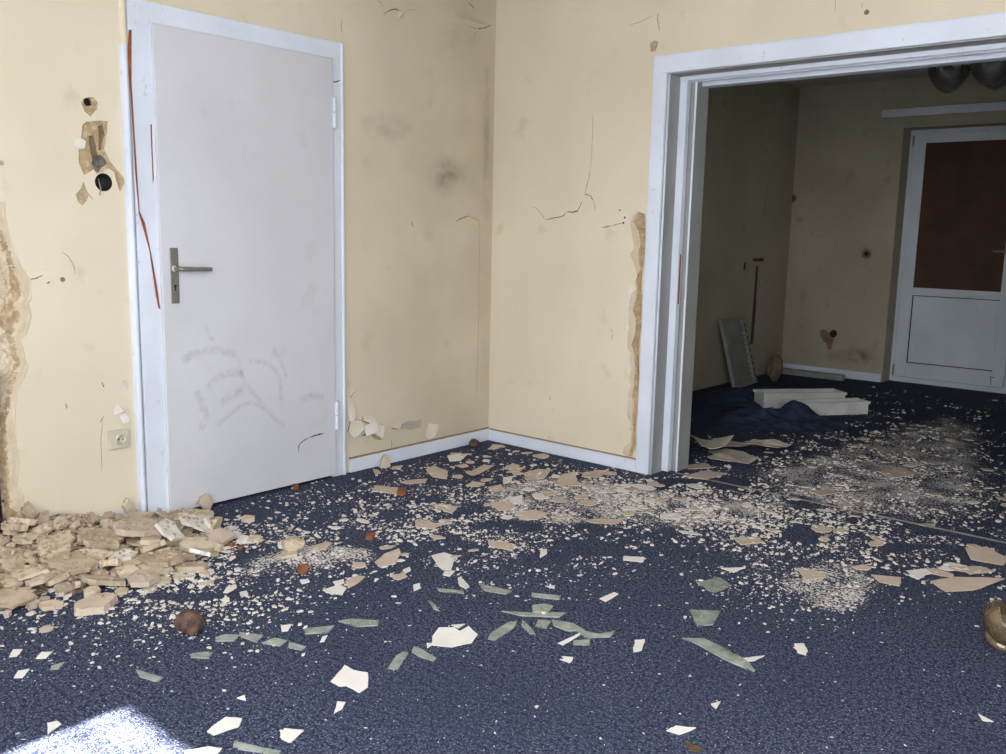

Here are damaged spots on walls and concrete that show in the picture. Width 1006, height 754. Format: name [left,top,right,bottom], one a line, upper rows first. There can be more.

flaking render [73,96,125,206]
crack [534,125,622,227]
flaking render [0,200,33,522]
flaking render [622,211,646,458]
peeling [347,398,438,440]